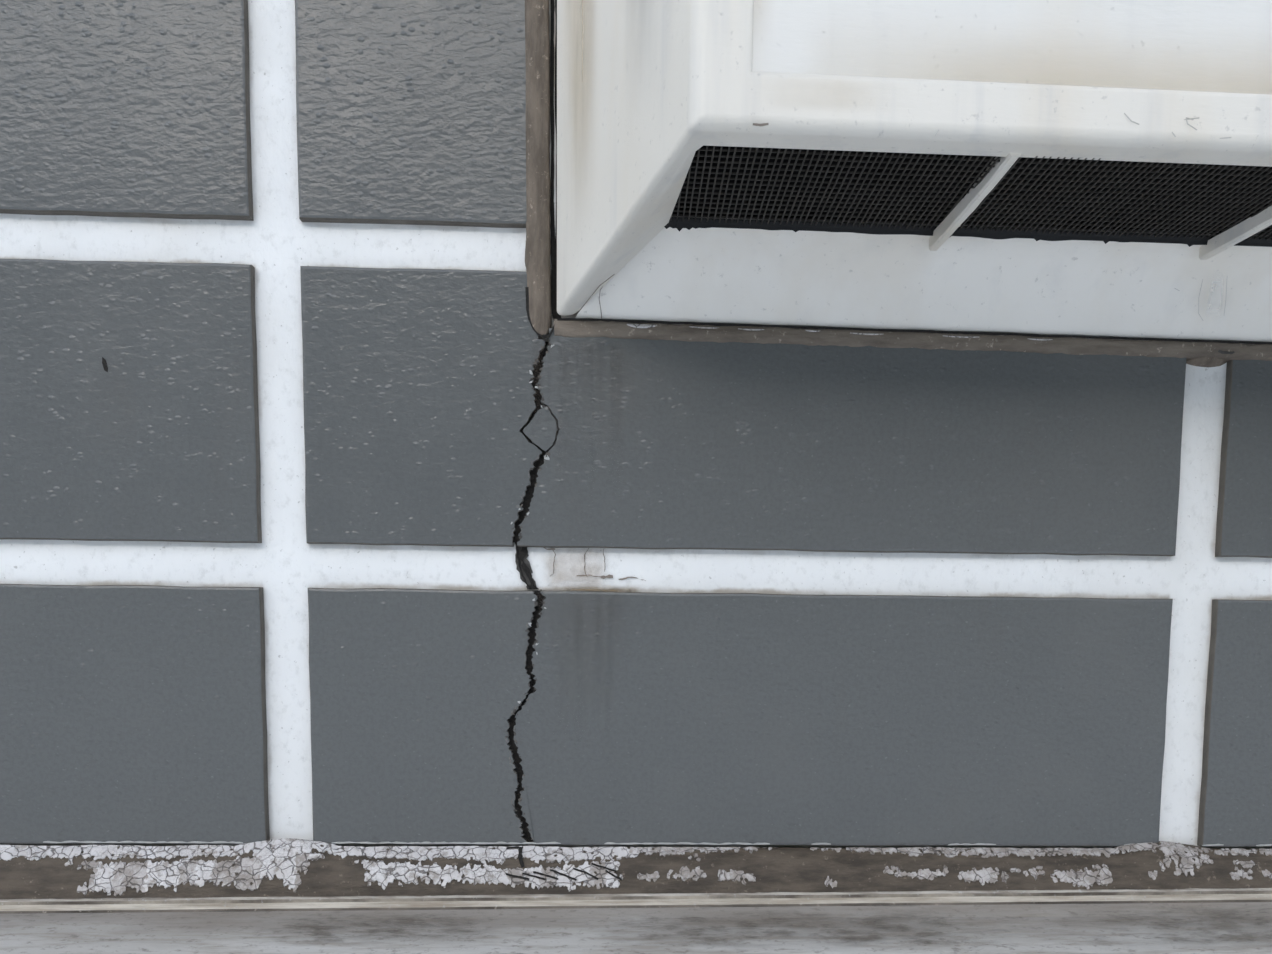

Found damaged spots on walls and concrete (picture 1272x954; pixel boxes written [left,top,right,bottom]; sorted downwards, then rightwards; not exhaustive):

crack [505,340,646,881]
peeling [0,838,778,896]
peeling [809,841,1272,889]